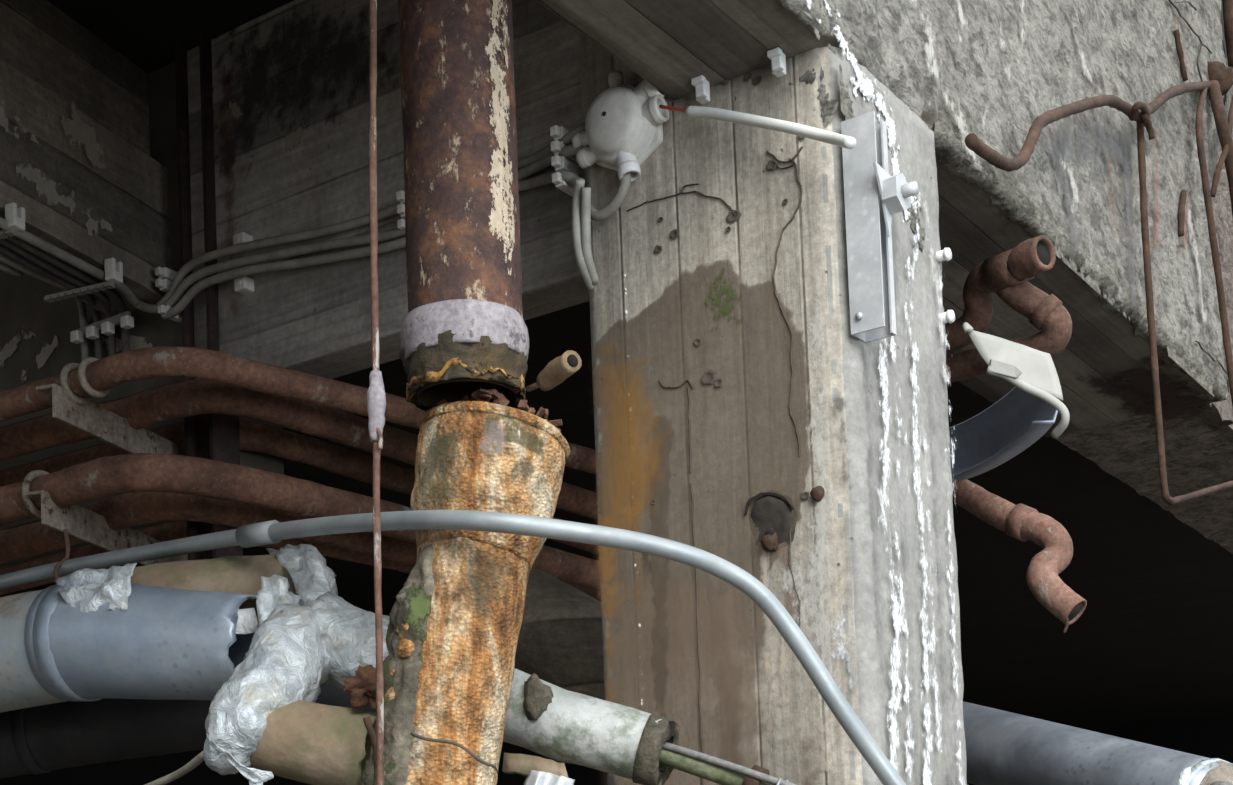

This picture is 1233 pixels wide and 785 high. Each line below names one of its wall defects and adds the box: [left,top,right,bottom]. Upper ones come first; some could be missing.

water stain [214,12,394,232]
efflorescence [806,0,905,177]
water stain [922,15,939,76]
water stain [944,94,975,159]
spalling [934,91,1226,401]
corrosion [1178,189,1188,241]
water stain [1186,208,1207,321]
corrosion [1080,358,1215,422]
water stain [595,260,859,716]
water stain [878,196,964,785]
water stain [600,546,788,768]
water stain [663,769,720,785]